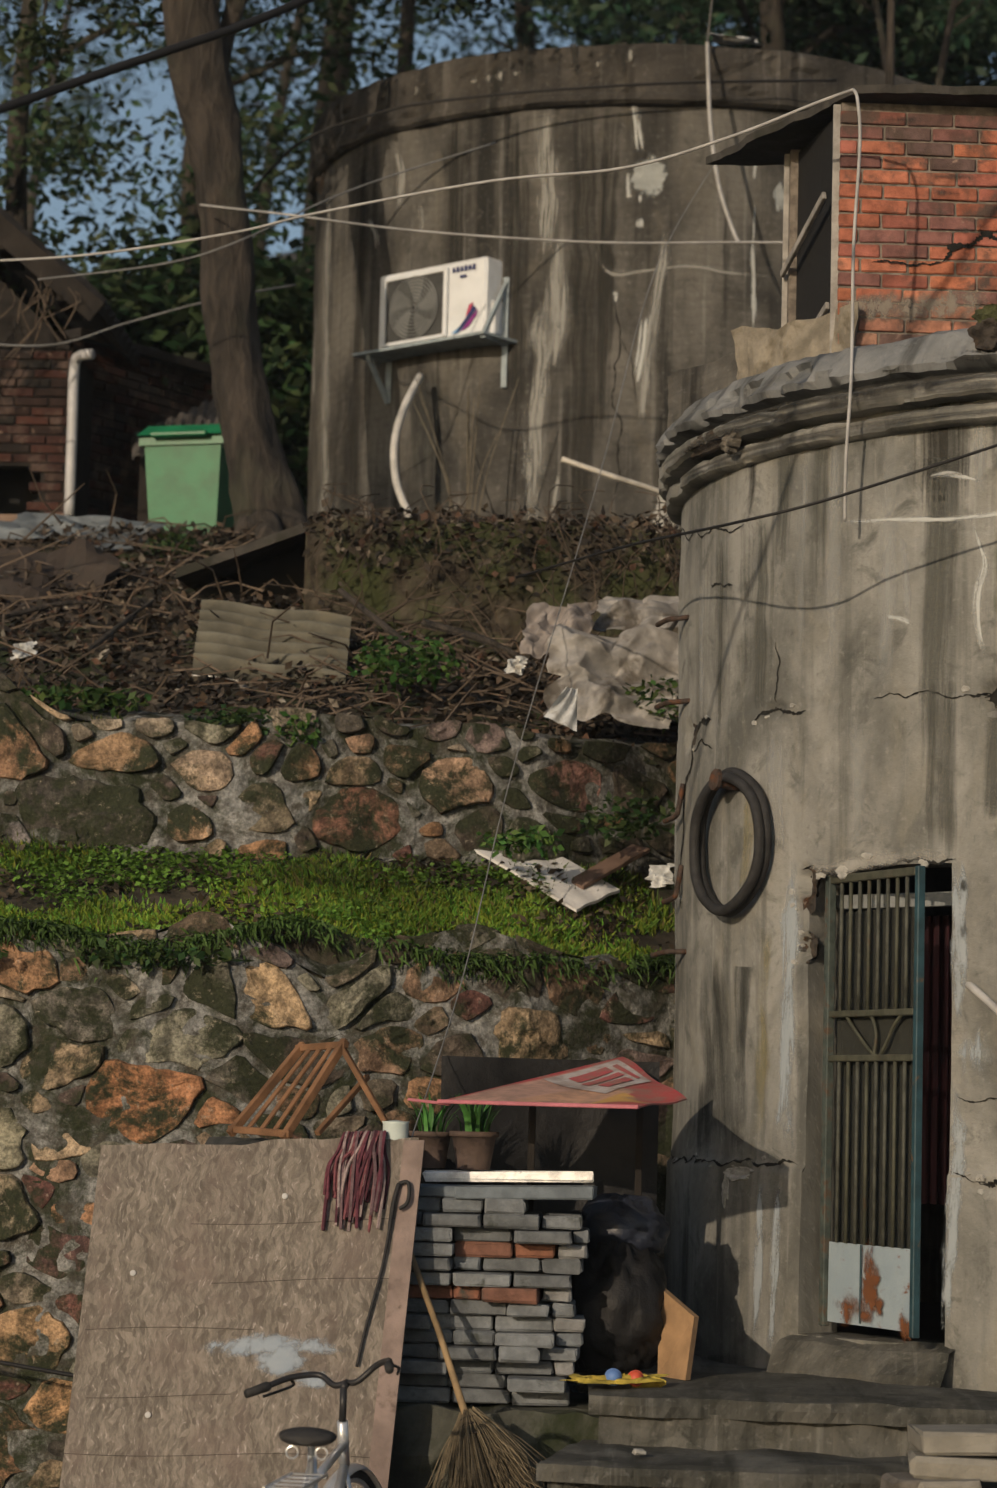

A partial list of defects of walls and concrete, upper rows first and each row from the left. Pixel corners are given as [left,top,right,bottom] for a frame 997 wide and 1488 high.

peeling [626,106,668,202]
leakage [446,127,468,263]
crack [873,231,997,267]
leakage [507,109,757,521]
leakage [667,350,997,833]
crack [751,644,805,726]
crack [876,685,997,709]
crack [957,1095,997,1103]
crack [670,1149,796,1168]
crack [950,1171,997,1195]
rust [841,1249,883,1324]
rust [899,1314,911,1340]